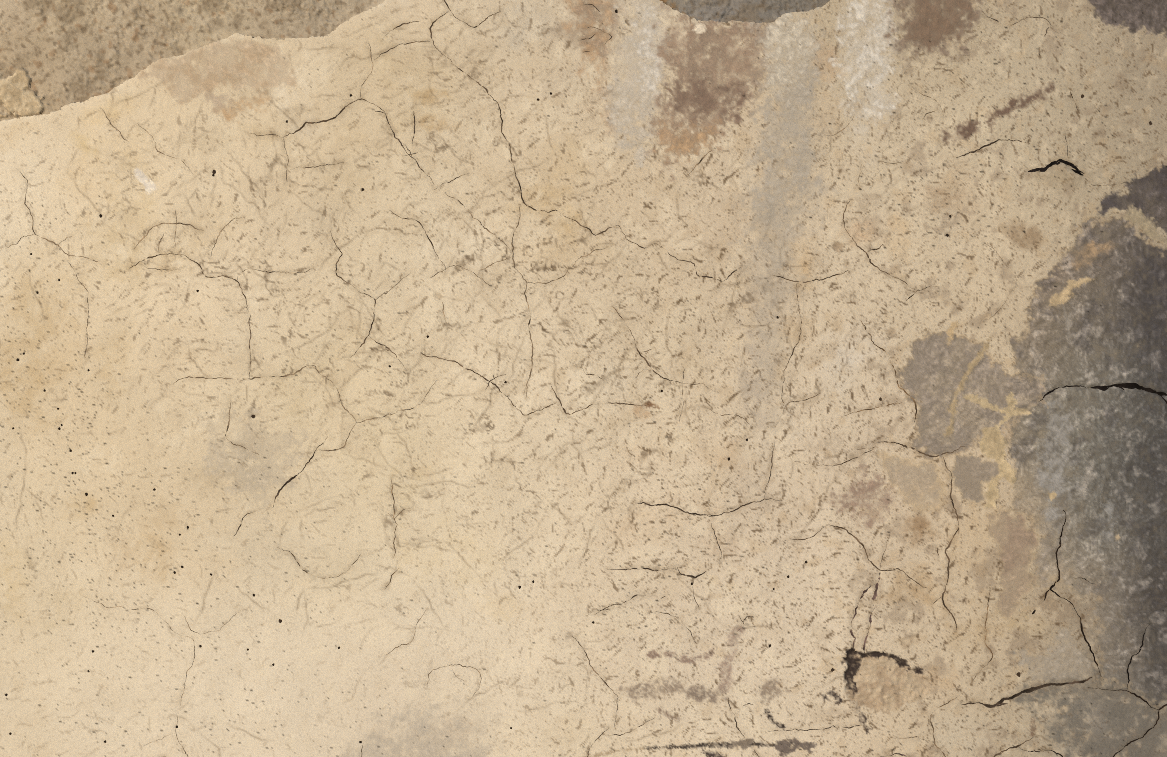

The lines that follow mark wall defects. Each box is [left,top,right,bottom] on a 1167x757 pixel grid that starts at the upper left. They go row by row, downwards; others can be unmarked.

flaking render [0,67,47,119]
crack [130,0,749,536]
damp [580,0,668,179]
crack [596,321,965,653]
damp [719,0,909,468]
crack [773,161,937,412]
peeling [892,162,1167,713]
crack [956,136,1125,186]
crack [1039,383,1167,404]
spalling [837,644,931,716]
crack [899,510,1167,757]
damp [976,622,1167,757]